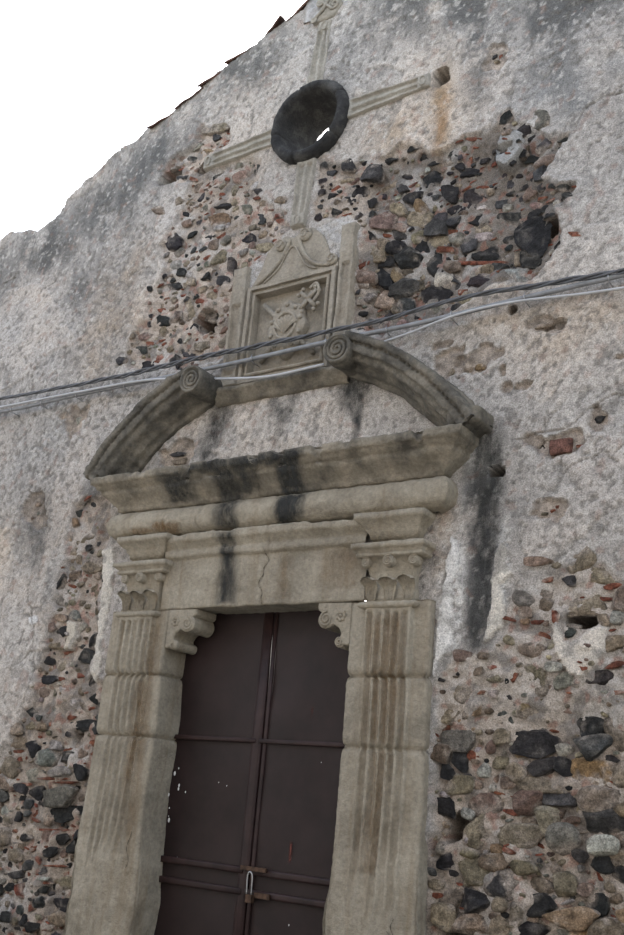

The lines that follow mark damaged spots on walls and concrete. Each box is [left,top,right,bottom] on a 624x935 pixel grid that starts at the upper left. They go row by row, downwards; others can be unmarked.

crack [574,85,624,127]
spalling [158,165,183,186]
spalling [547,213,559,238]
spalling [195,306,220,334]
flaking render [525,313,568,333]
flaking render [522,403,610,459]
damp [163,450,304,601]
peeling [64,620,82,650]
peeling [90,546,117,681]
peeling [432,535,460,675]
peeling [483,541,515,641]
peeling [552,608,610,676]